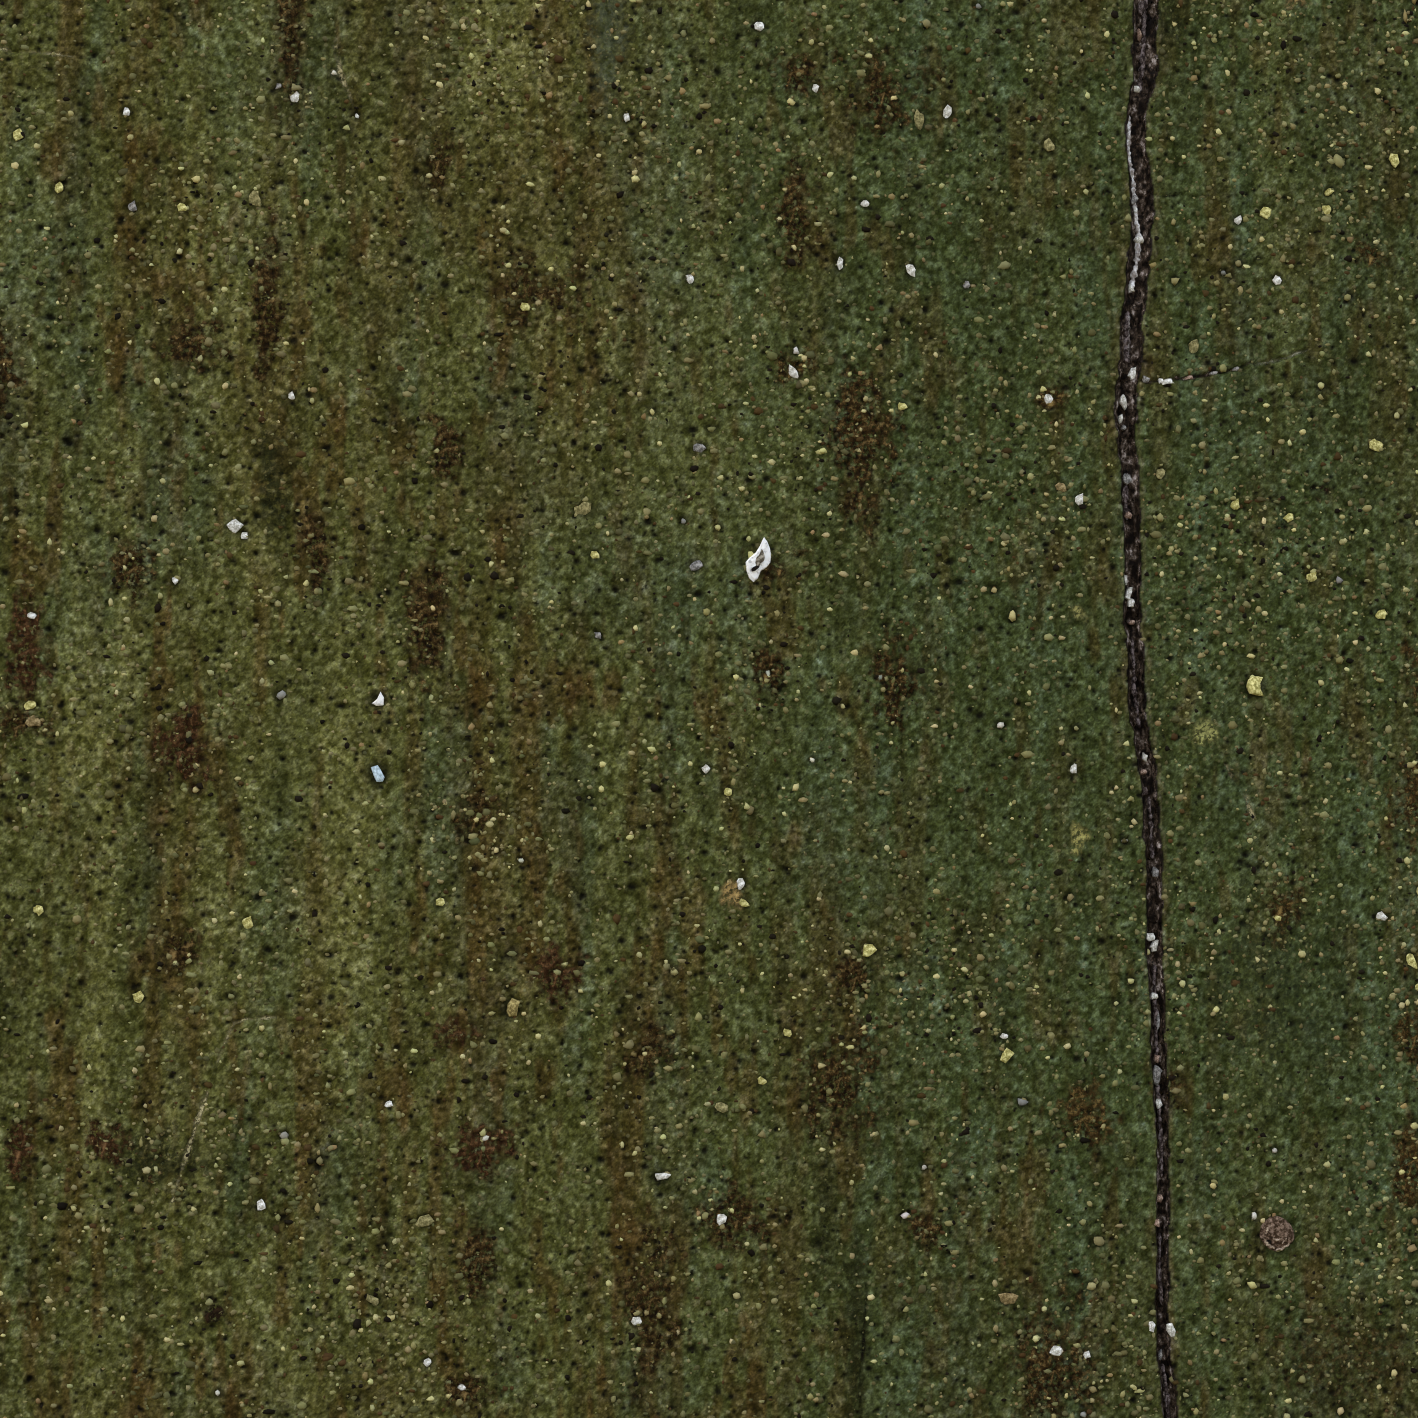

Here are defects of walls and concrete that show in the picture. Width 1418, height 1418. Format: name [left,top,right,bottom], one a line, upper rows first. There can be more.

crack [1114,0,1301,1418]